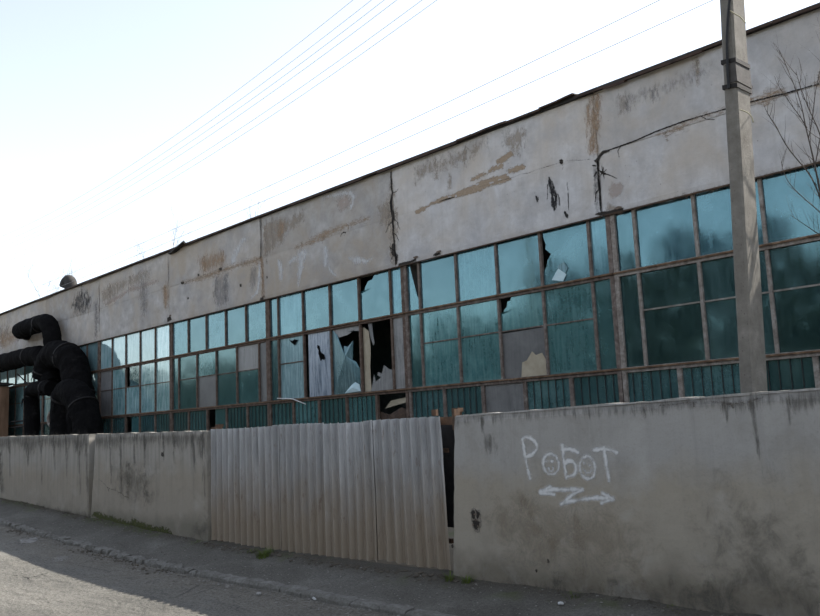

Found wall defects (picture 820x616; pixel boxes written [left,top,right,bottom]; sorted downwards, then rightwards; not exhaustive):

crack [750,84,819,103]
peeling [415,151,525,214]
crack [592,108,726,211]
crack [385,172,399,264]
spalling [469,508,481,533]